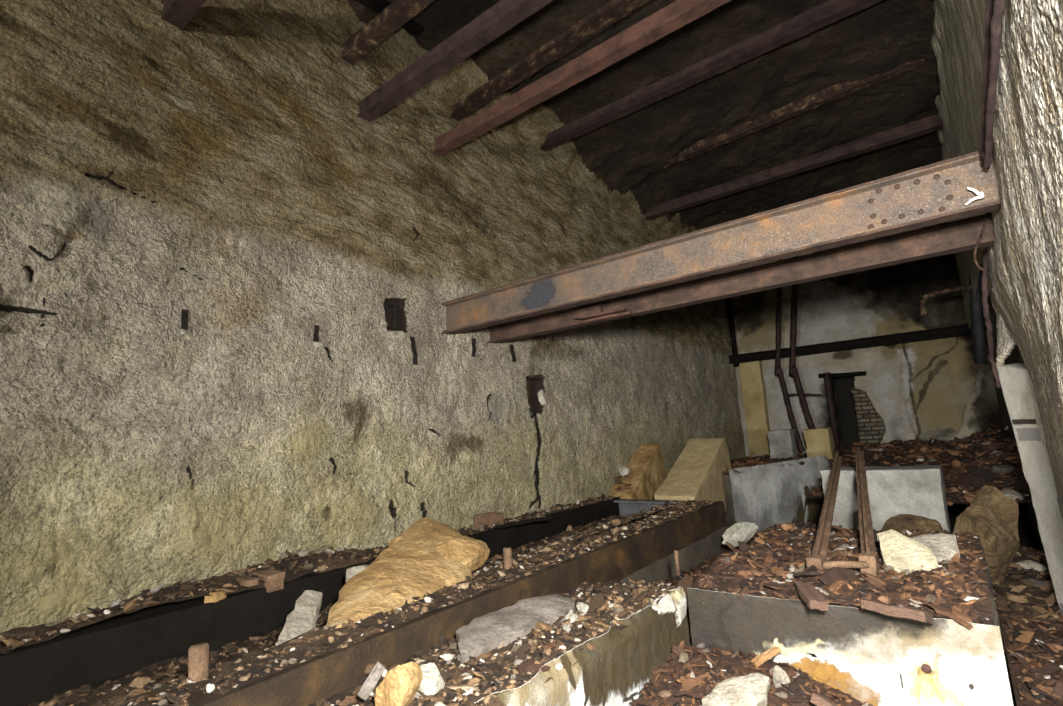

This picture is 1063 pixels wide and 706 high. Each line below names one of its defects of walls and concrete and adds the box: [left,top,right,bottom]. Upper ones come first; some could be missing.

crack [85,171,156,203]
peeling [797,280,882,359]
peeling [763,364,826,433]
spalling [851,337,975,444]
crack [902,336,958,439]
crack [529,408,542,509]
damp [504,587,1001,706]